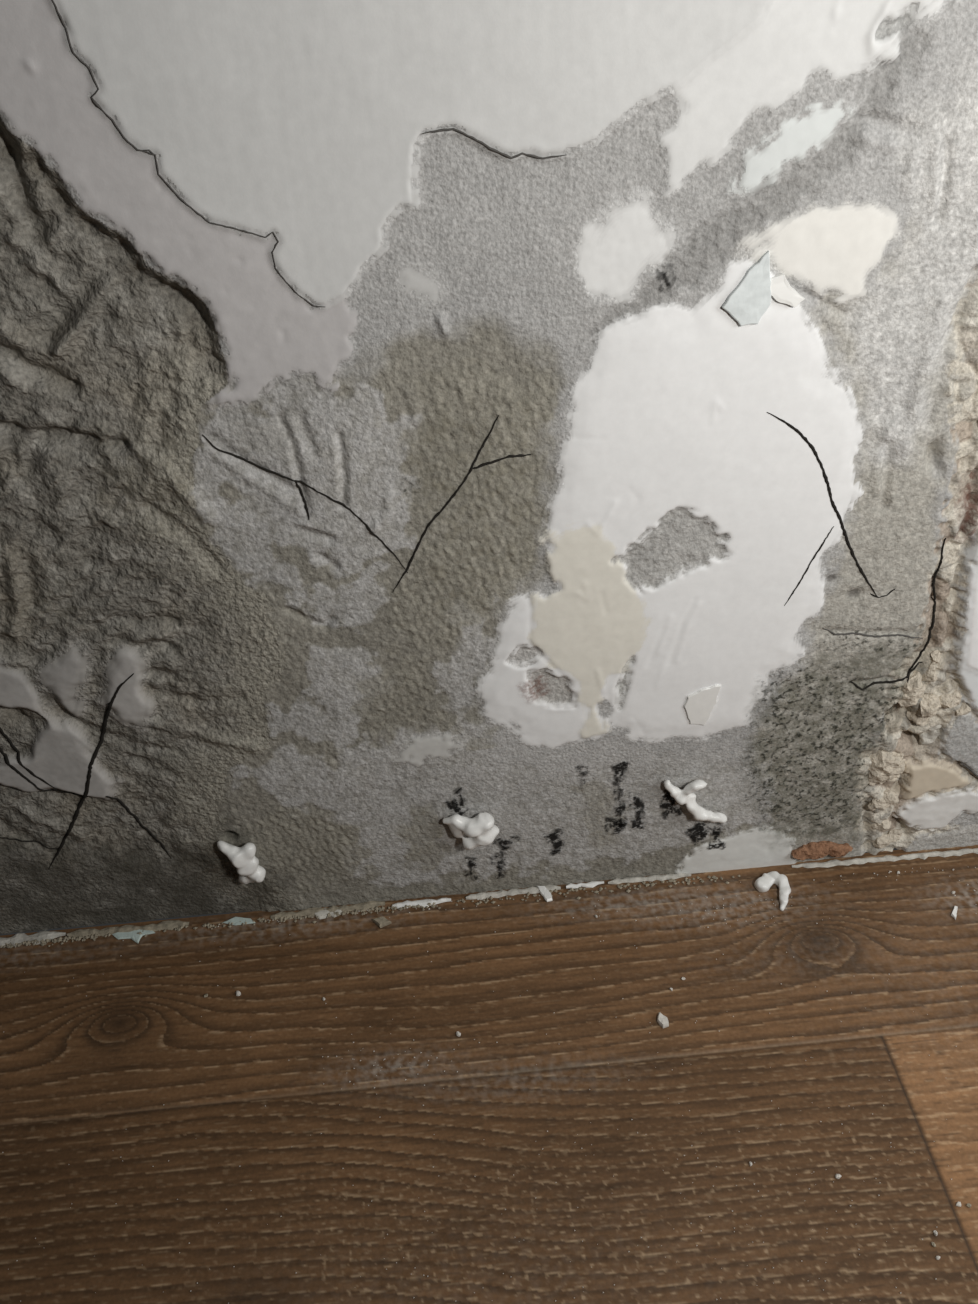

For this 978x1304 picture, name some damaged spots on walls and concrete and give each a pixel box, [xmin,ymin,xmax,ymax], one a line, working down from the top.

crack [202,415,531,592]
peeling [0,0,978,944]
crack [767,412,895,606]
crack [823,538,946,691]
crack [0,673,172,870]